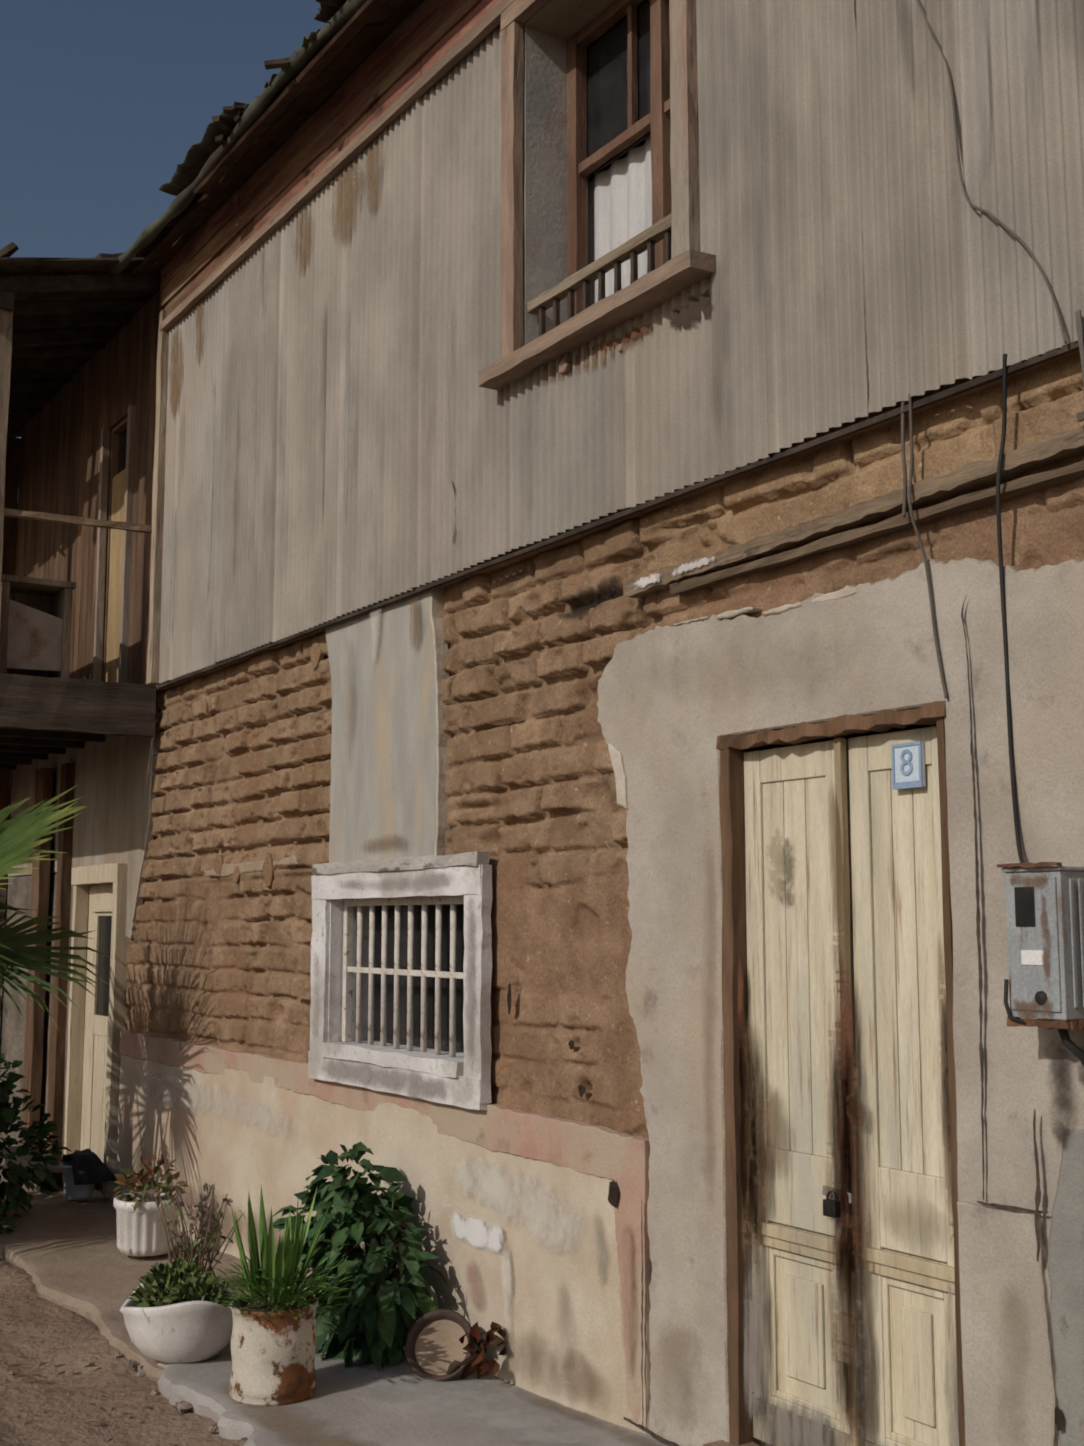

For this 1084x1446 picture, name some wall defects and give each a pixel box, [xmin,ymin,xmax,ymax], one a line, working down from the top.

spalling [541,325,651,383]
spalling [670,290,712,329]
spalling [441,353,1084,1139]
damp [827,790,868,1444]